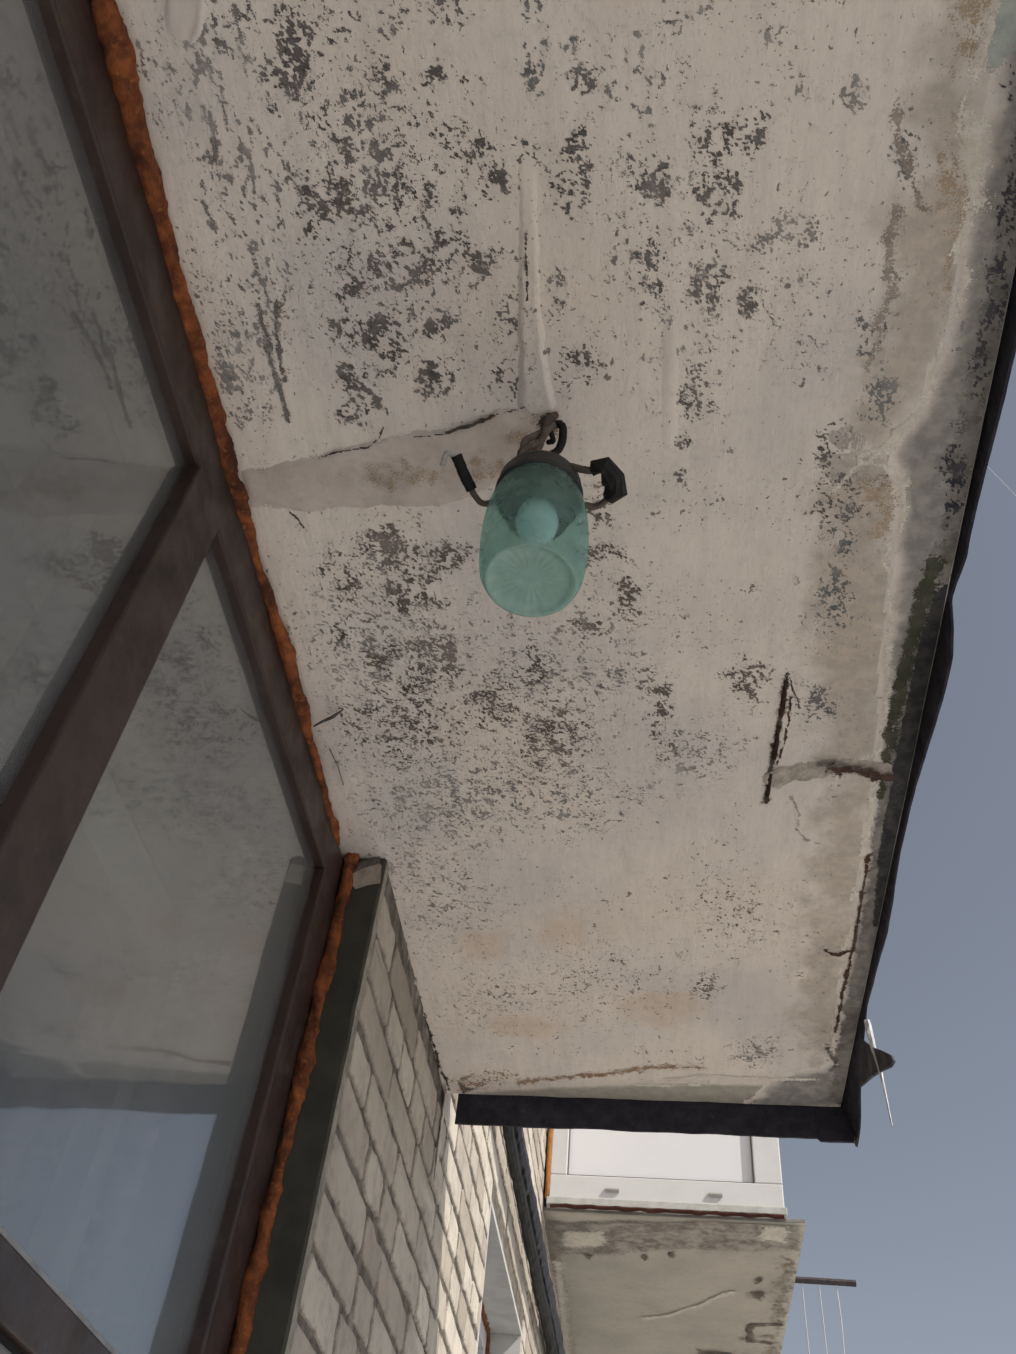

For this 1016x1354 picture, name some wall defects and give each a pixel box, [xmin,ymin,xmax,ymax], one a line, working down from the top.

crack [319,407,525,459]
leakage [432,0,1016,1107]
rust [823,853,872,1033]